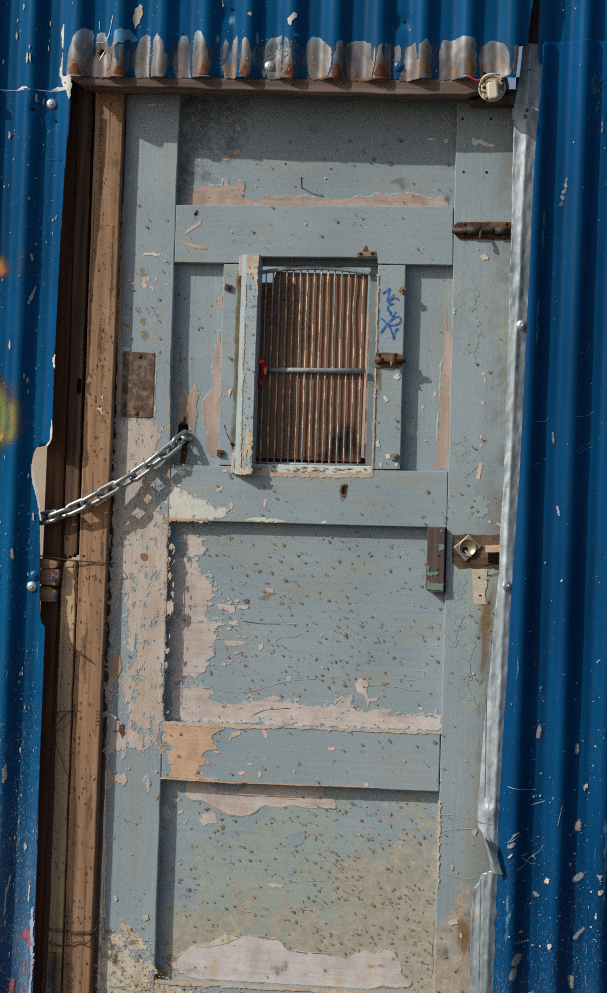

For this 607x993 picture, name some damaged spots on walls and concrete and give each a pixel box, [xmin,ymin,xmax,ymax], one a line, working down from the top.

corrosion [319,64,389,81]
peeling [433,308,456,471]
peeling [93,256,442,837]
peeling [94,914,413,993]